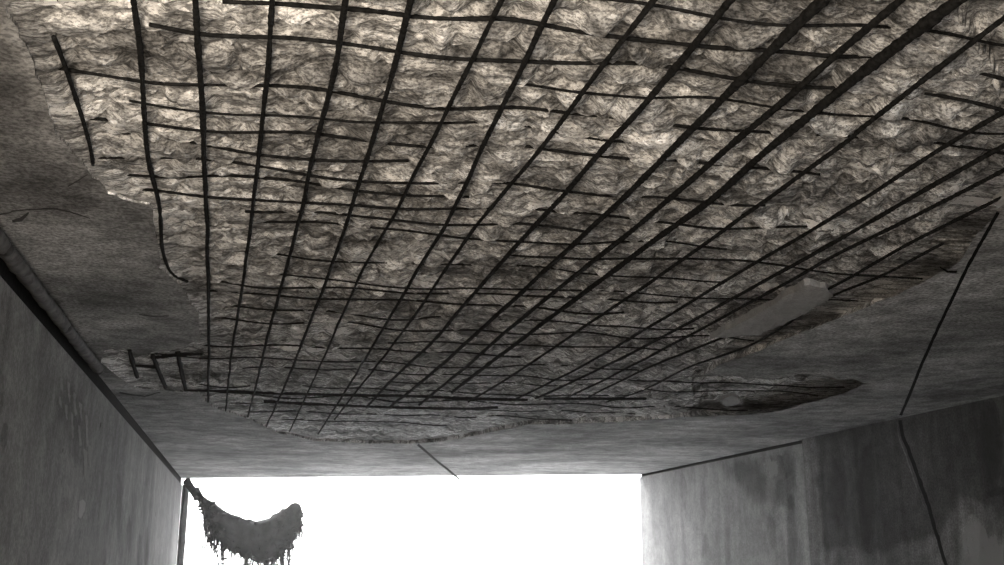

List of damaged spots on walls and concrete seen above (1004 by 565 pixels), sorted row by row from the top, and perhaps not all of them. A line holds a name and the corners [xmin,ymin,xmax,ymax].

spalling [5,0,1004,444]
crack [897,212,999,565]